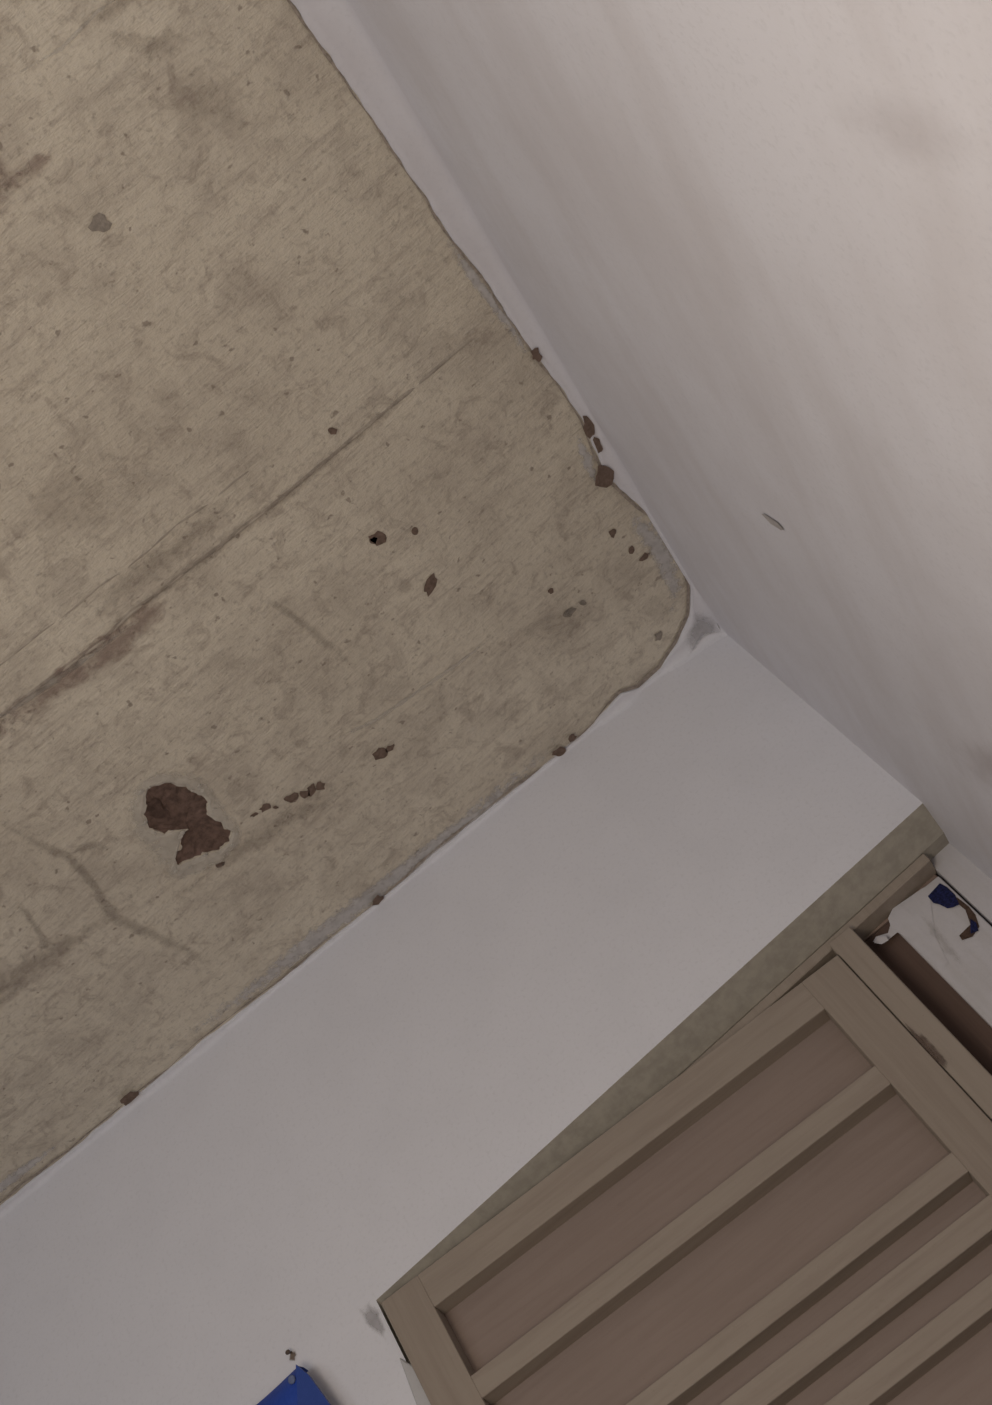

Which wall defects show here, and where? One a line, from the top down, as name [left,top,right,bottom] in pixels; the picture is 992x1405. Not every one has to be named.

spalling [88,213,112,232]
peeling [531,348,542,362]
peeling [583,416,614,488]
spalling [368,531,387,546]
spalling [424,573,438,596]
spalling [372,744,395,760]
peeling [552,734,577,756]
spalling [138,782,238,873]
peeling [873,882,979,966]
peeling [120,1091,139,1106]